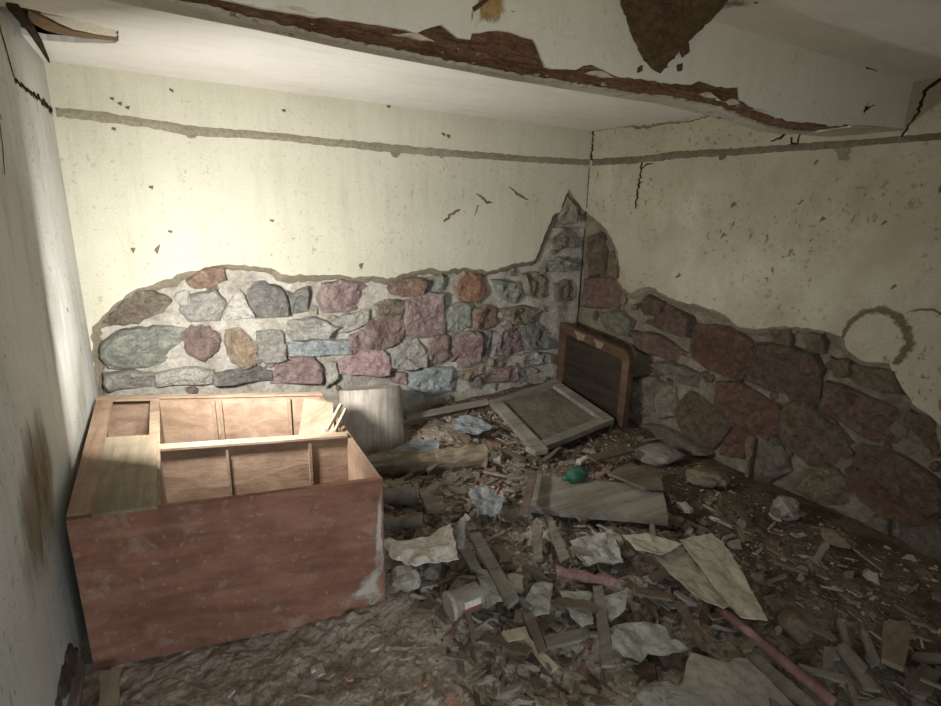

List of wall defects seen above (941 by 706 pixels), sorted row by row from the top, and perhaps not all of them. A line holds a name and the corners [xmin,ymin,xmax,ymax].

crack [0,26,53,117]
spalling [6,2,118,63]
corrosion [472,0,515,21]
spalling [181,0,849,130]
crack [901,78,941,137]
flaking render [90,190,891,395]
leakage [25,426,53,577]
flaking render [54,643,79,706]